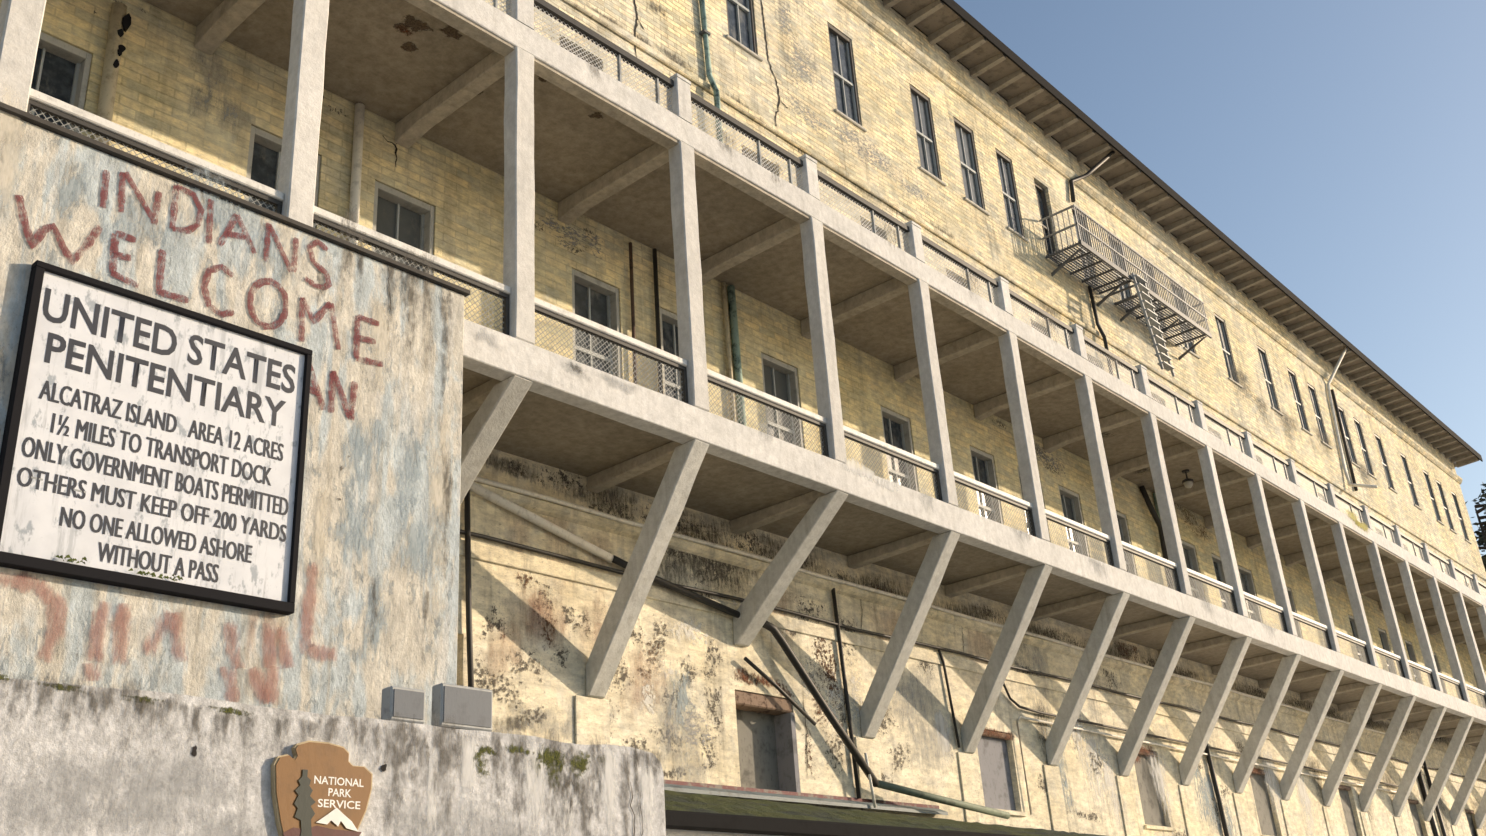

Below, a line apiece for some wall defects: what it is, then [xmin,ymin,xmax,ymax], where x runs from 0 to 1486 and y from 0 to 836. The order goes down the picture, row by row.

crack [634,0,644,57]
crack [761,0,788,126]
water stain [11,677,201,732]